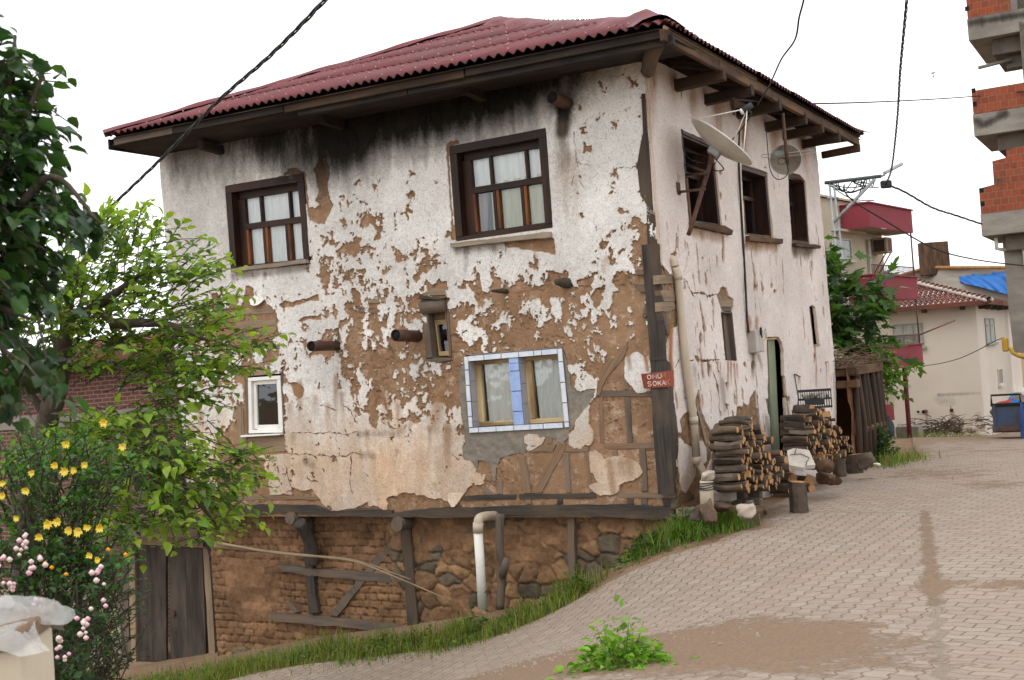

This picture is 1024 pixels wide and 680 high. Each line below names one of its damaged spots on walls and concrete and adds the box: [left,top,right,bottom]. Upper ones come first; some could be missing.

peeling [580,113,617,153]
crack [683,256,720,299]
peeling [177,140,711,517]
crack [286,395,368,493]